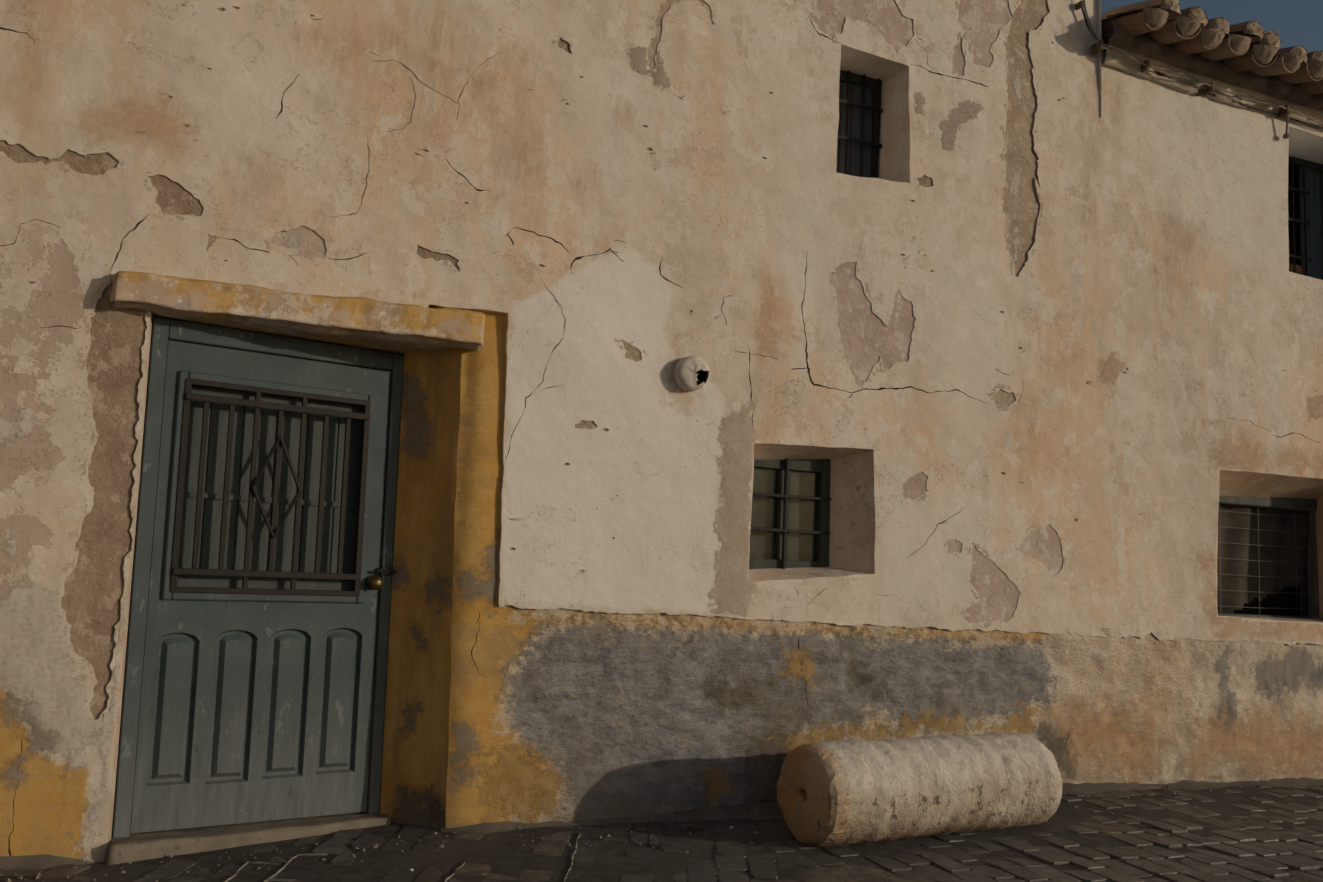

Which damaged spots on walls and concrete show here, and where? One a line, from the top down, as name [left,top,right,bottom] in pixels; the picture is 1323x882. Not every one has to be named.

flaking render [0,140,124,176]
crack [110,216,147,276]
flaking render [144,172,204,220]
crack [276,75,298,120]
crack [329,52,505,217]
flaking render [628,0,714,99]
flaking render [952,0,1051,278]
crack [501,227,624,481]
crack [721,252,983,444]
flaking render [829,260,916,386]
flaking render [61,279,147,739]
flaking render [944,539,1021,628]